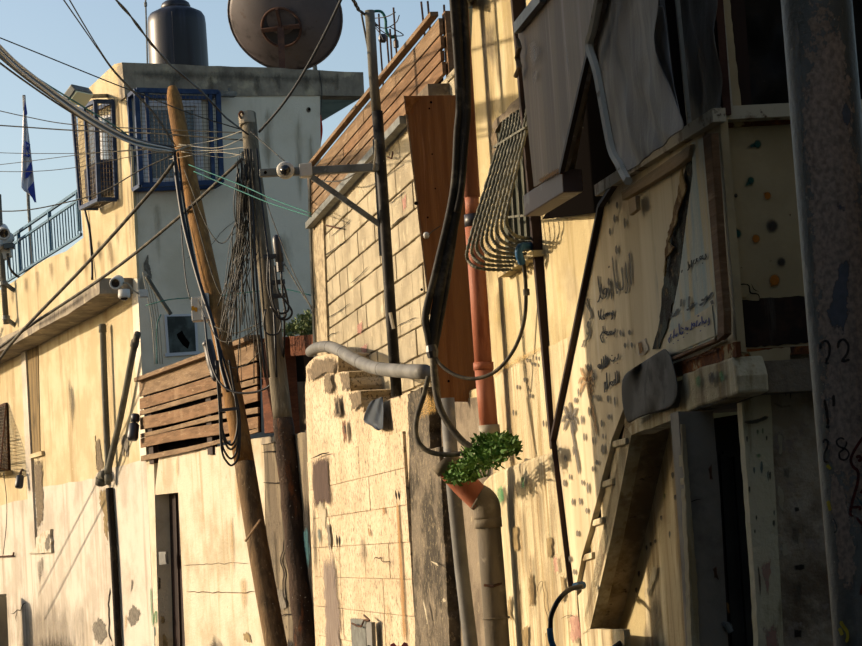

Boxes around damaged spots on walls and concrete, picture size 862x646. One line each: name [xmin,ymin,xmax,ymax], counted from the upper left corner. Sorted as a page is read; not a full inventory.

flaking render [29,457,54,554]
crack [190,588,254,596]
peeling [127,605,140,626]
peeling [92,618,107,644]